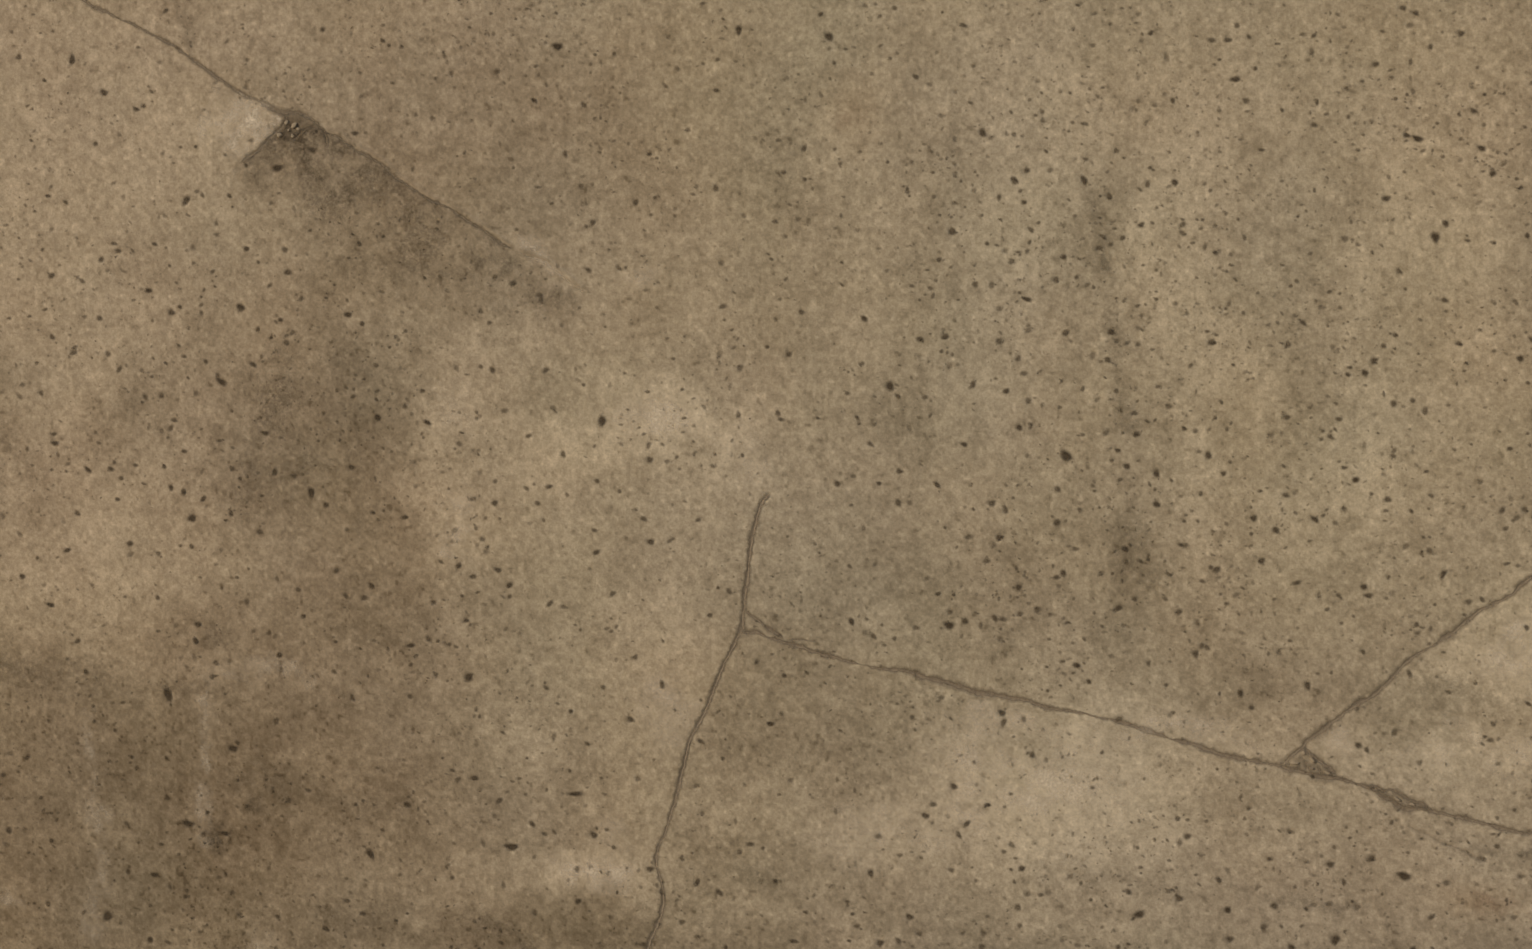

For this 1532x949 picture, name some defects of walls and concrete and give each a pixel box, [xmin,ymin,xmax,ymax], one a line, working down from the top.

crack [82,0,579,289]
crack [646,495,1532,949]